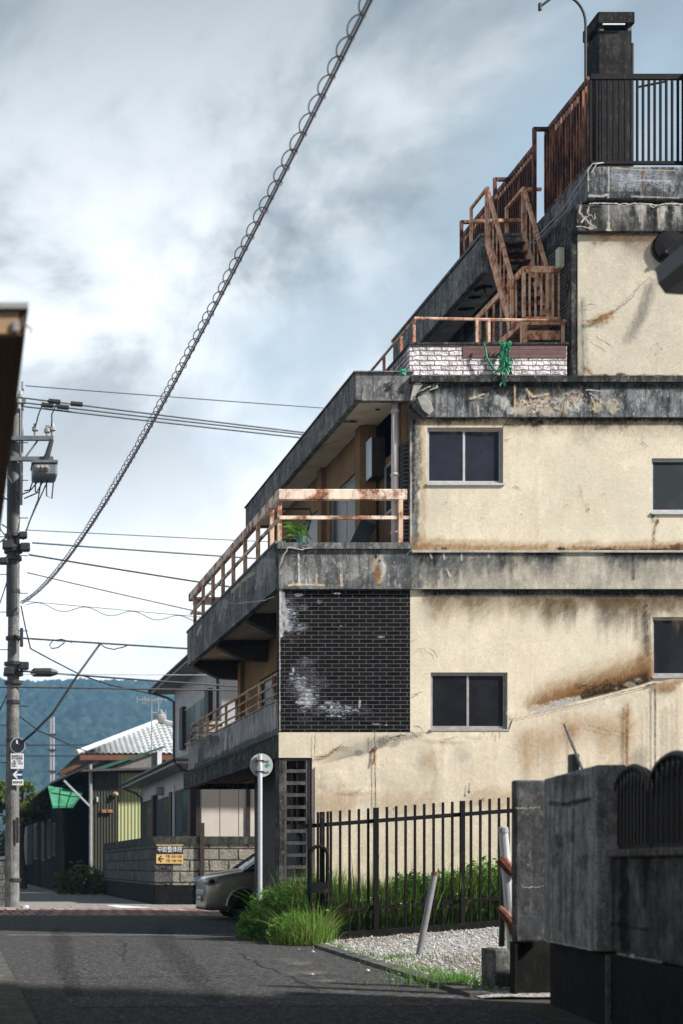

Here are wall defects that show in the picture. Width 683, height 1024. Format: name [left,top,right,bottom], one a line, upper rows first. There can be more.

crack [583,276,651,348]
spalling [406,382,439,420]
corrosion [372,555,386,585]
damp [392,383,683,706]
damp [194,589,360,770]
crack [314,733,348,758]